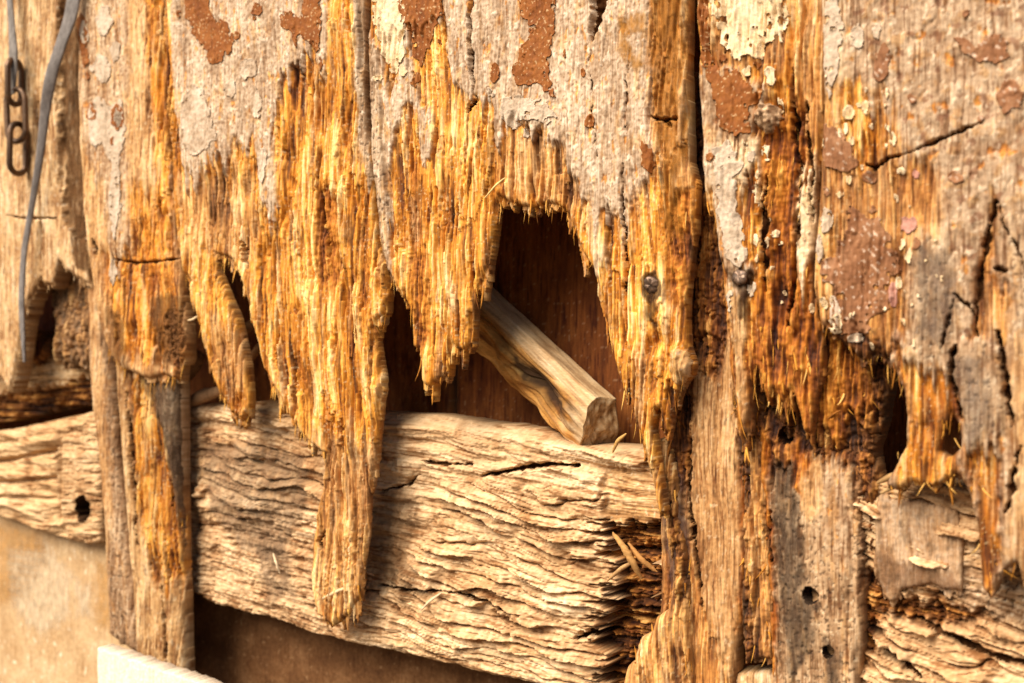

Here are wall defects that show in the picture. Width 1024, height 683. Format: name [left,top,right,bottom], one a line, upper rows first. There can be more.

peeling [176,0,240,65]
peeling [280,0,323,71]
peeling [372,0,445,88]
peeling [486,0,566,138]
peeling [953,34,1010,64]
peeling [640,141,657,174]
peeling [697,0,791,268]
peeling [796,0,927,351]
crack [866,126,975,171]
crack [93,240,178,265]
crack [942,201,1023,423]
crack [385,460,581,491]